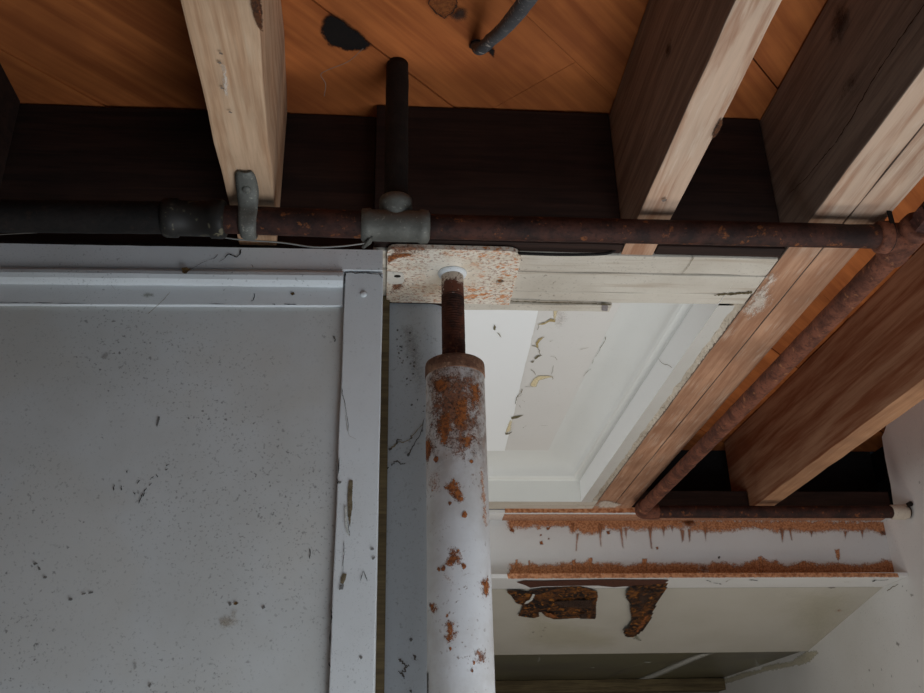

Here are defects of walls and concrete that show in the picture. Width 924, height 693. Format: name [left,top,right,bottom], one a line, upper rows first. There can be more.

corrosion [388,246,427,263]
peeling [526,311,557,387]
corrosion [426,367,484,518]
corrosion [437,547,466,571]
corrosion [502,507,899,579]
corrosion [429,603,457,651]
spalling [507,579,668,637]